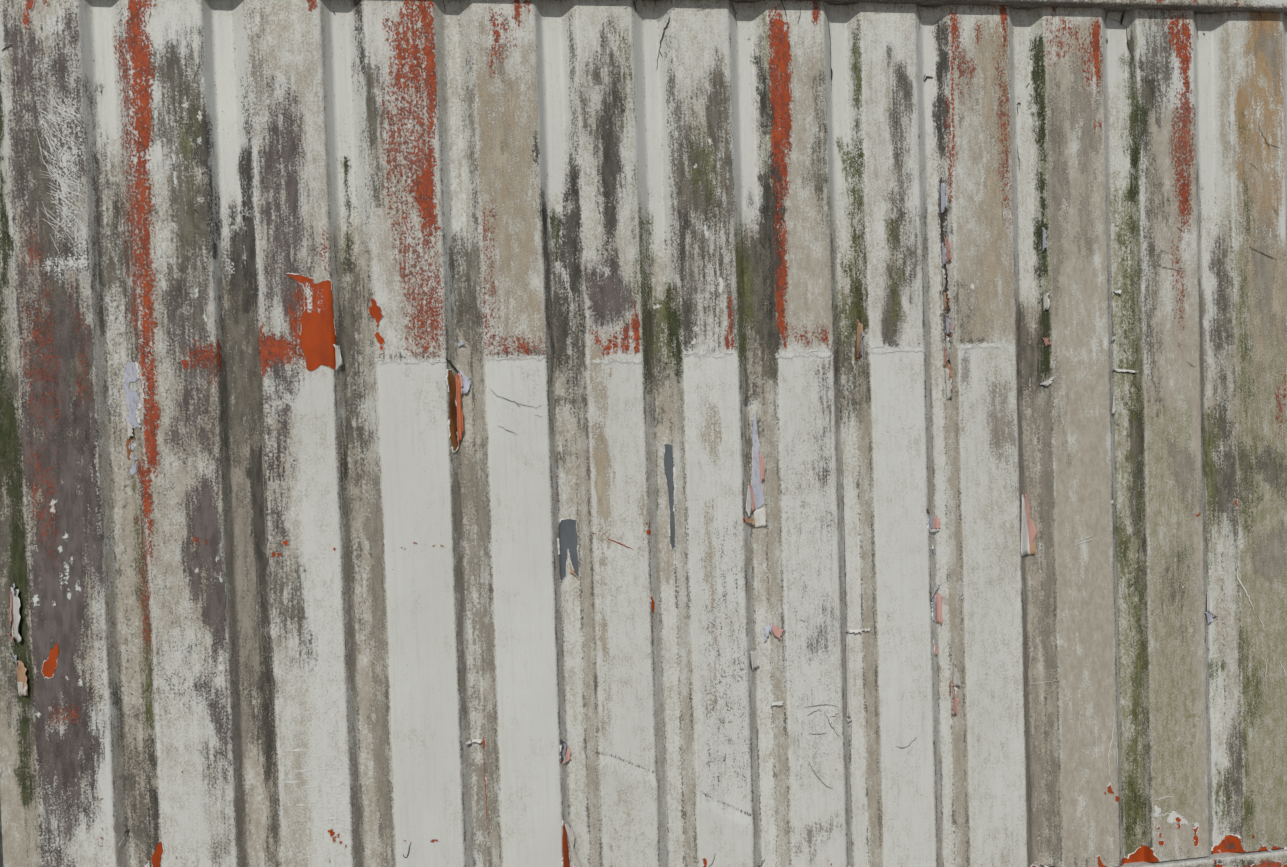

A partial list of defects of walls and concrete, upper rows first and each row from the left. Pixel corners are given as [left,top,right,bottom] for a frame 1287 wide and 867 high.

leakage [2,0,161,867]
peeling [114,0,161,671]
leakage [150,7,319,867]
peeling [258,225,343,381]
peeling [368,298,385,352]
peeling [378,0,444,358]
peeling [557,518,579,582]
leakage [538,20,640,429]
peeling [590,297,642,356]
peeling [766,3,829,347]
peeling [1157,0,1199,350]
leakage [1215,711,1243,835]